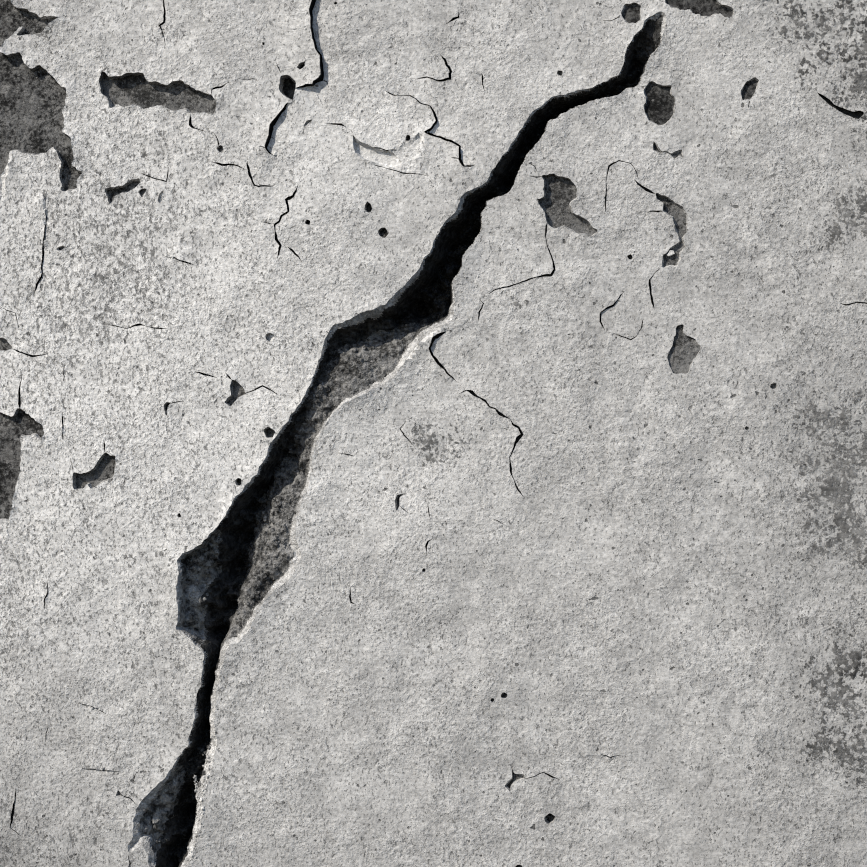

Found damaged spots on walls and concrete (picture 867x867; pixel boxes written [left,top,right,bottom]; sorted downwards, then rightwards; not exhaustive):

flaking render [665,0,735,17]
flaking render [0,0,82,191]
flaking render [99,69,228,131]
spalling [644,81,676,126]
flaking render [478,163,598,320]
flaking render [605,160,688,308]
spalling [0,338,48,357]
crack [107,322,166,330]
spalling [667,324,701,374]
flaking render [0,369,44,521]
spalling [70,442,116,490]
crack [128,0,667,867]